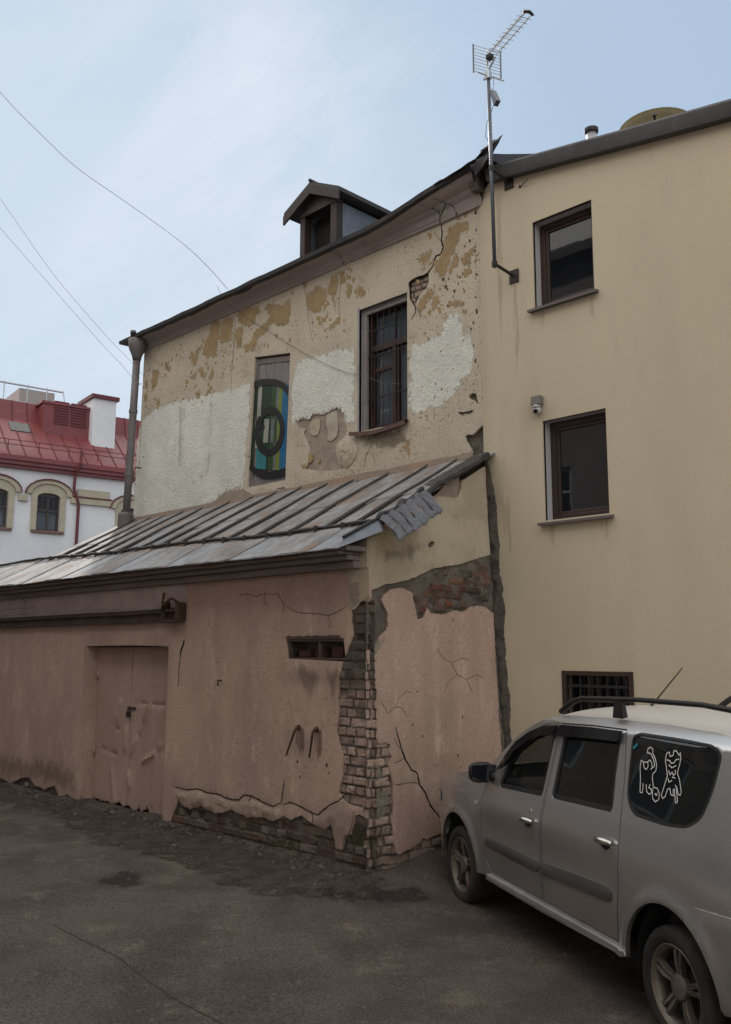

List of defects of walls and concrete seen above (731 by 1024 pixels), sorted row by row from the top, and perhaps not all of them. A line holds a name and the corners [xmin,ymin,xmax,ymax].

crack [409,199,457,320]
peeling [411,210,479,363]
spalling [296,407,347,471]
flaking render [172,428,512,872]
crack [176,782,345,825]
crack [381,691,440,817]